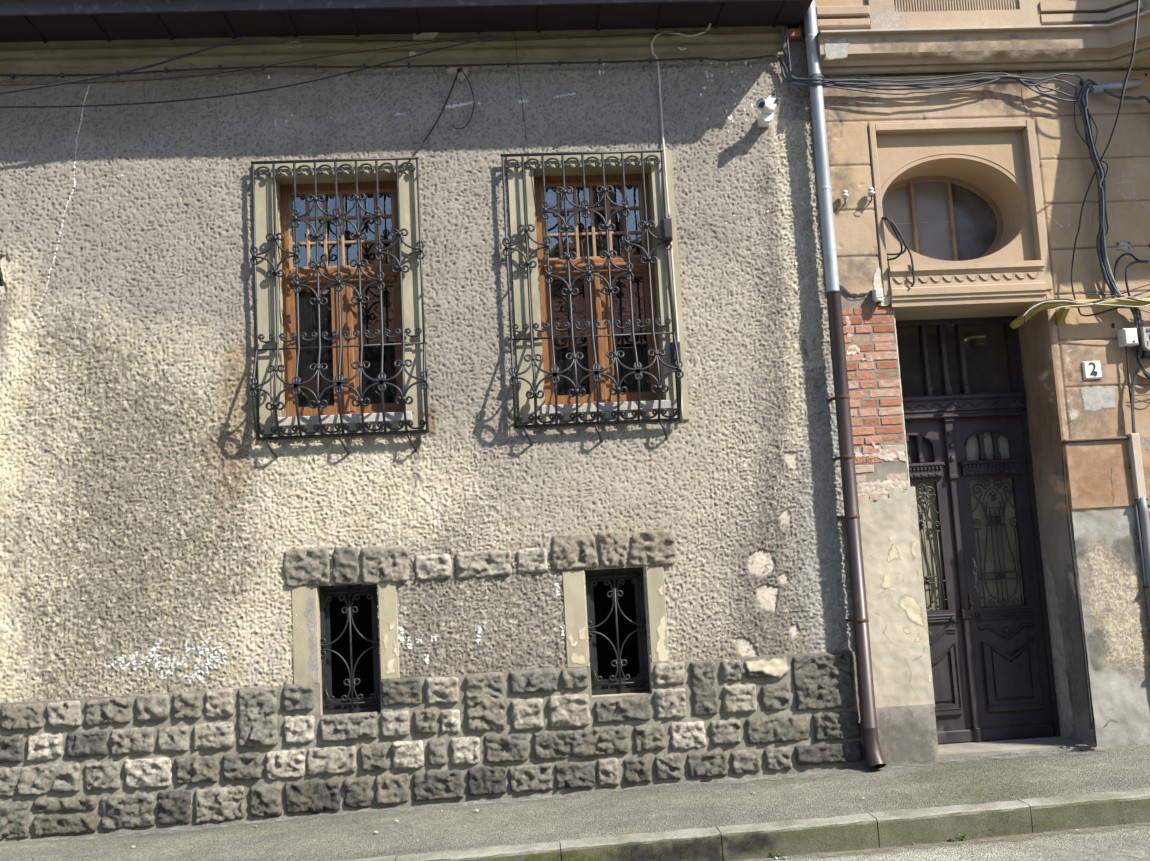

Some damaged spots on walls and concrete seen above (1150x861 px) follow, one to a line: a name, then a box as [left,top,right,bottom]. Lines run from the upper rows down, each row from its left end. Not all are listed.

crack [37,85,90,329]
flaking render [842,268,910,501]
peeling [656,616,670,662]
peeling [734,638,758,657]
peeling [747,549,789,612]
peeling [899,596,925,642]
flaking render [1079,539,1150,677]